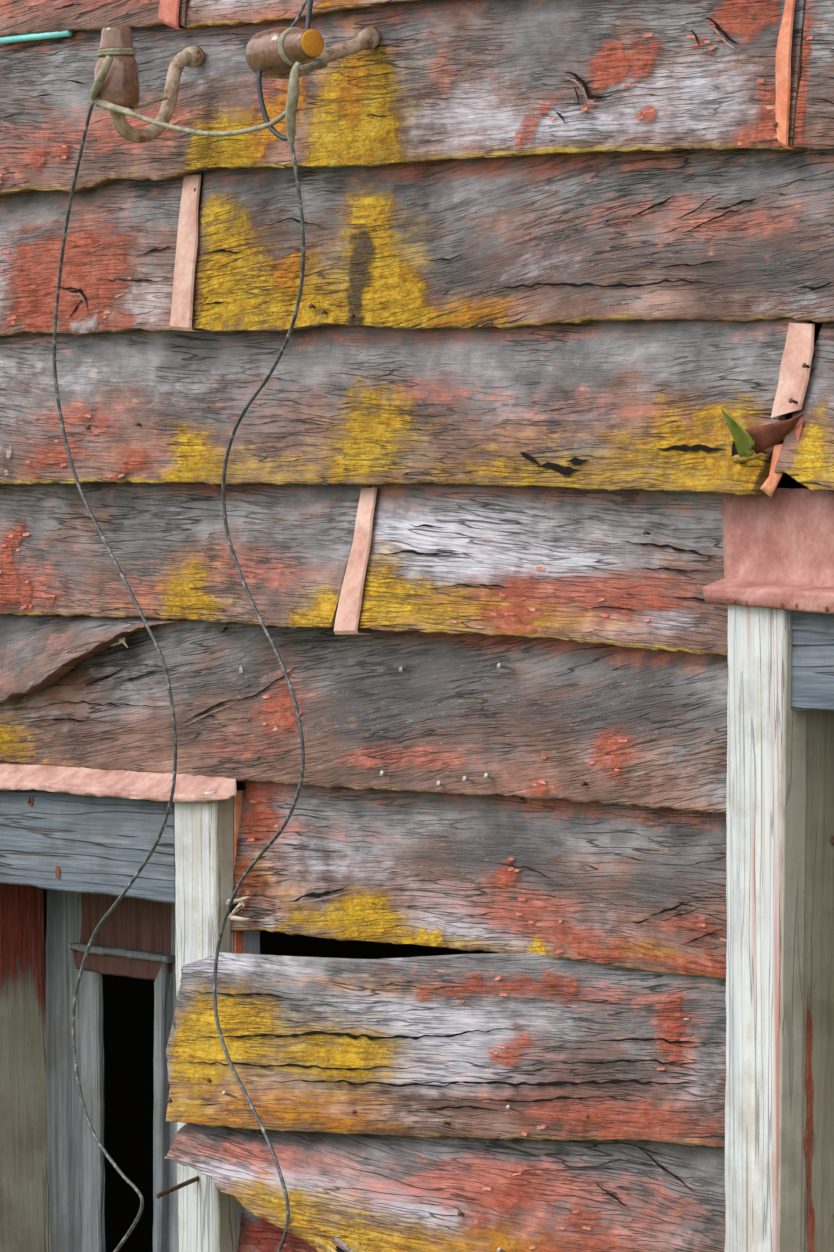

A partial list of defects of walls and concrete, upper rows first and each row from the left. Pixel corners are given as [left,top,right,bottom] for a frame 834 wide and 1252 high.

crack [629,192,765,233]
crack [426,253,464,261]
crack [469,260,731,297]
crack [800,282,834,290]
peeling [475,567,545,635]
peeling [598,594,673,622]
crack [192,991,309,1000]
crack [170,1025,721,1112]
crack [637,1146,693,1192]
crack [596,1183,630,1209]